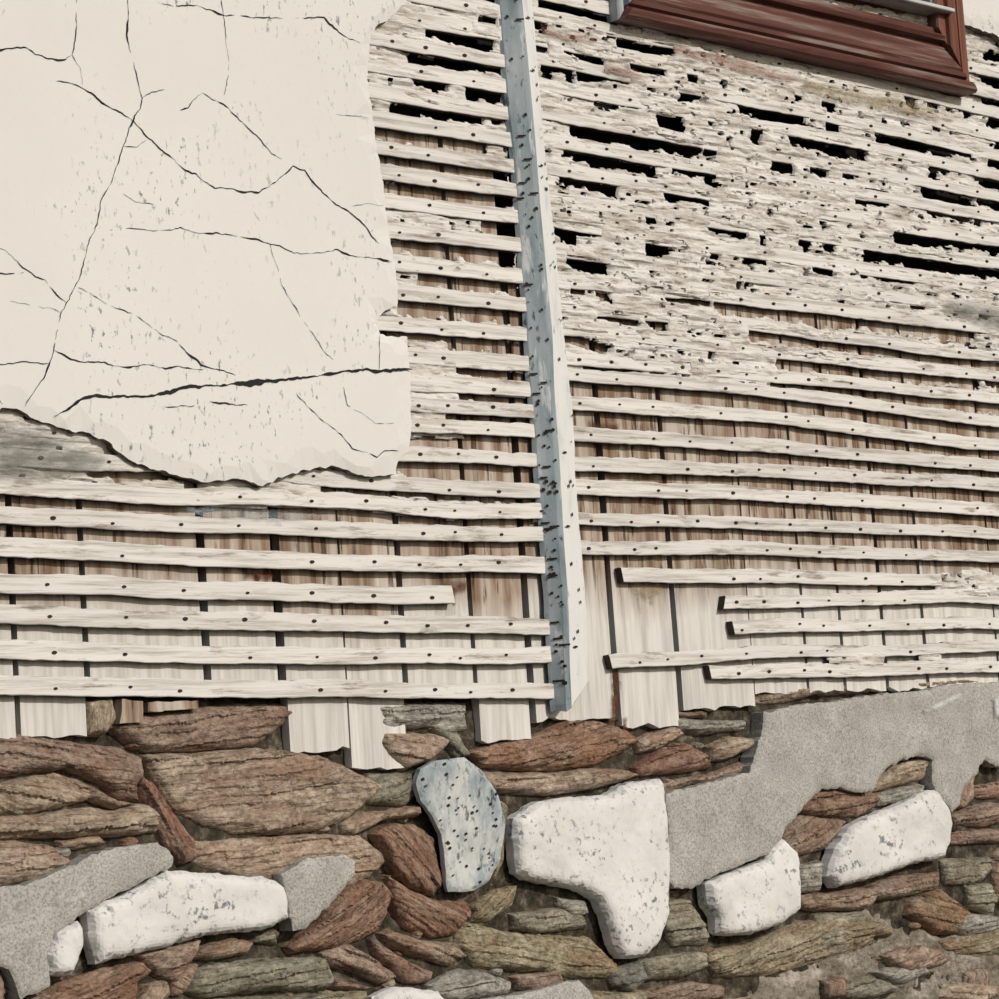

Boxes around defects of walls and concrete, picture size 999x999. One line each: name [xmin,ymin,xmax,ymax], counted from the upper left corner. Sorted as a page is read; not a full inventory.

flaking render [374,0,501,54]
flaking render [367,45,504,112]
flaking render [446,118,506,132]
flaking render [532,0,999,386]
crack [0,0,412,457]
flaking render [385,209,484,233]
flaking render [408,340,481,379]
flaking render [0,409,112,455]
flaking render [0,462,184,489]
flaking render [196,467,406,516]
flaking render [391,496,514,504]
flaking render [935,569,999,597]